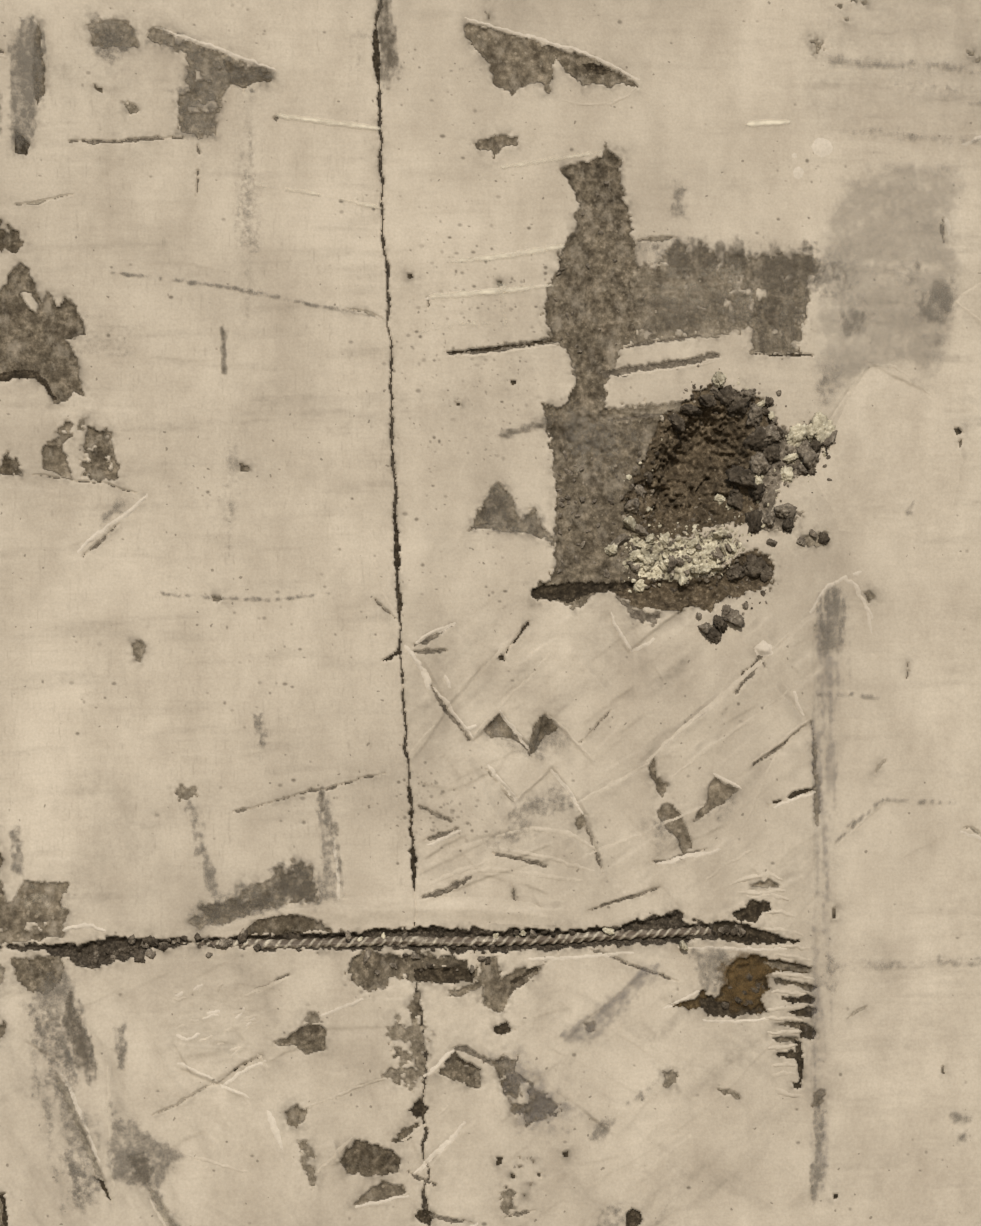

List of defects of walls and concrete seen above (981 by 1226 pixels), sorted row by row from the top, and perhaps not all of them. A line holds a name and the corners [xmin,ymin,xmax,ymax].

peeling [69,19,276,154]
peeling [464,15,640,106]
spalling [0,219,86,403]
water stain [922,281,953,322]
spalling [40,420,130,492]
crack [304,0,417,891]
spalling [446,146,839,644]
crack [235,776,374,813]
spalling [190,859,319,930]
spalling [0,853,115,1200]
crack [0,900,800,1226]
spalling [345,946,541,1035]